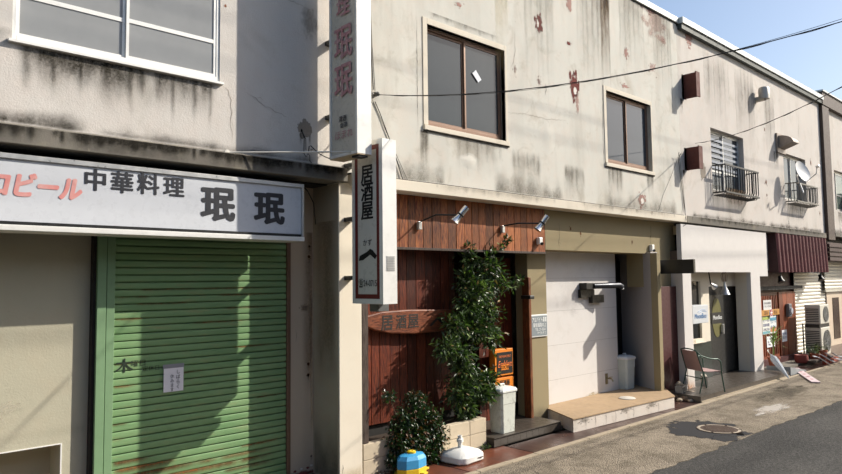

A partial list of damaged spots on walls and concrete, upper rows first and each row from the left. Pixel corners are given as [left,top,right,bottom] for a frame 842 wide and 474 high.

peeling [534,13,543,33]
damp [28,48,145,84]
damp [157,73,209,92]
peeling [569,70,579,103]
corrosion [114,458,217,474]